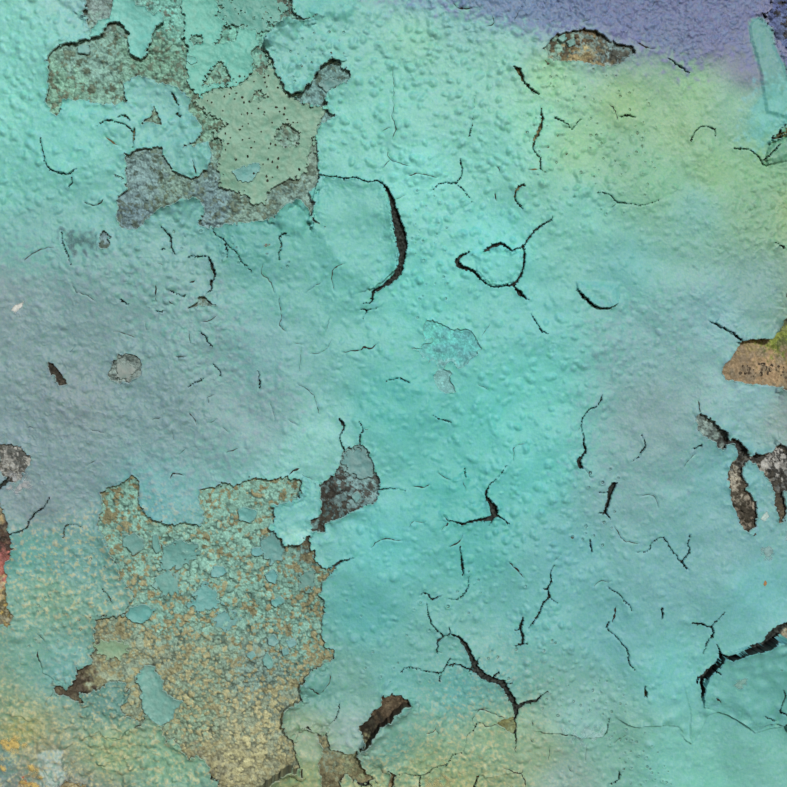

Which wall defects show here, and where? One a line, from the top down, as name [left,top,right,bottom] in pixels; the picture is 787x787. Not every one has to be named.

peeling [543,27,637,67]
peeling [45,0,351,241]
crack [318,78,473,319]
crack [494,65,582,210]
crack [454,216,553,334]
peeling [722,318,787,391]
peeling [0,503,14,629]
peeling [36,444,412,787]
crack [396,444,568,787]
crack [576,395,603,476]
crack [598,482,691,570]
peeling [695,413,787,536]